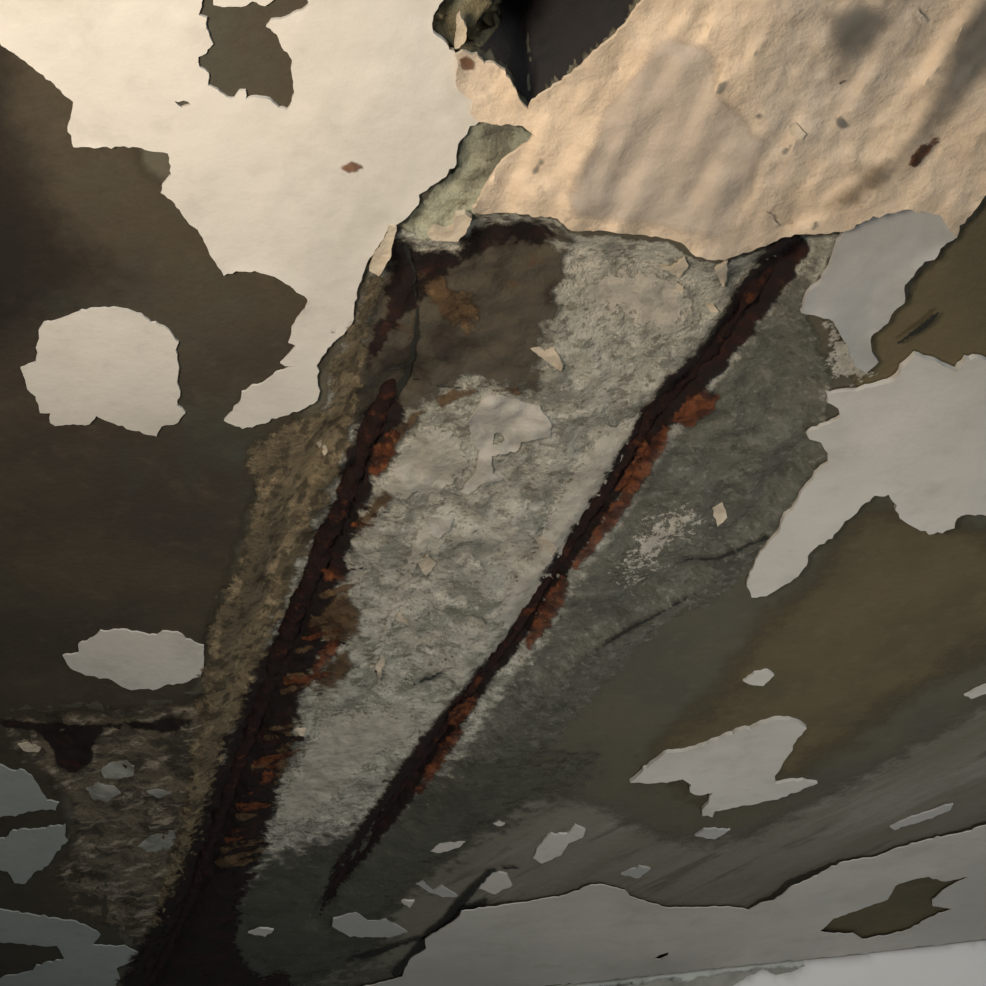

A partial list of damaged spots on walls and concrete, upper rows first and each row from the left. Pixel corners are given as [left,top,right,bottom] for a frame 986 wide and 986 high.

corrosion [0,718,193,773]
corrosion [116,399,425,986]
peeling [0,0,777,986]
water stain [334,215,575,519]
water stain [231,262,874,986]
corrosion [318,234,809,916]
peeling [303,204,986,986]
water stain [569,40,766,240]
water stain [834,9,882,57]
water stain [925,0,986,132]